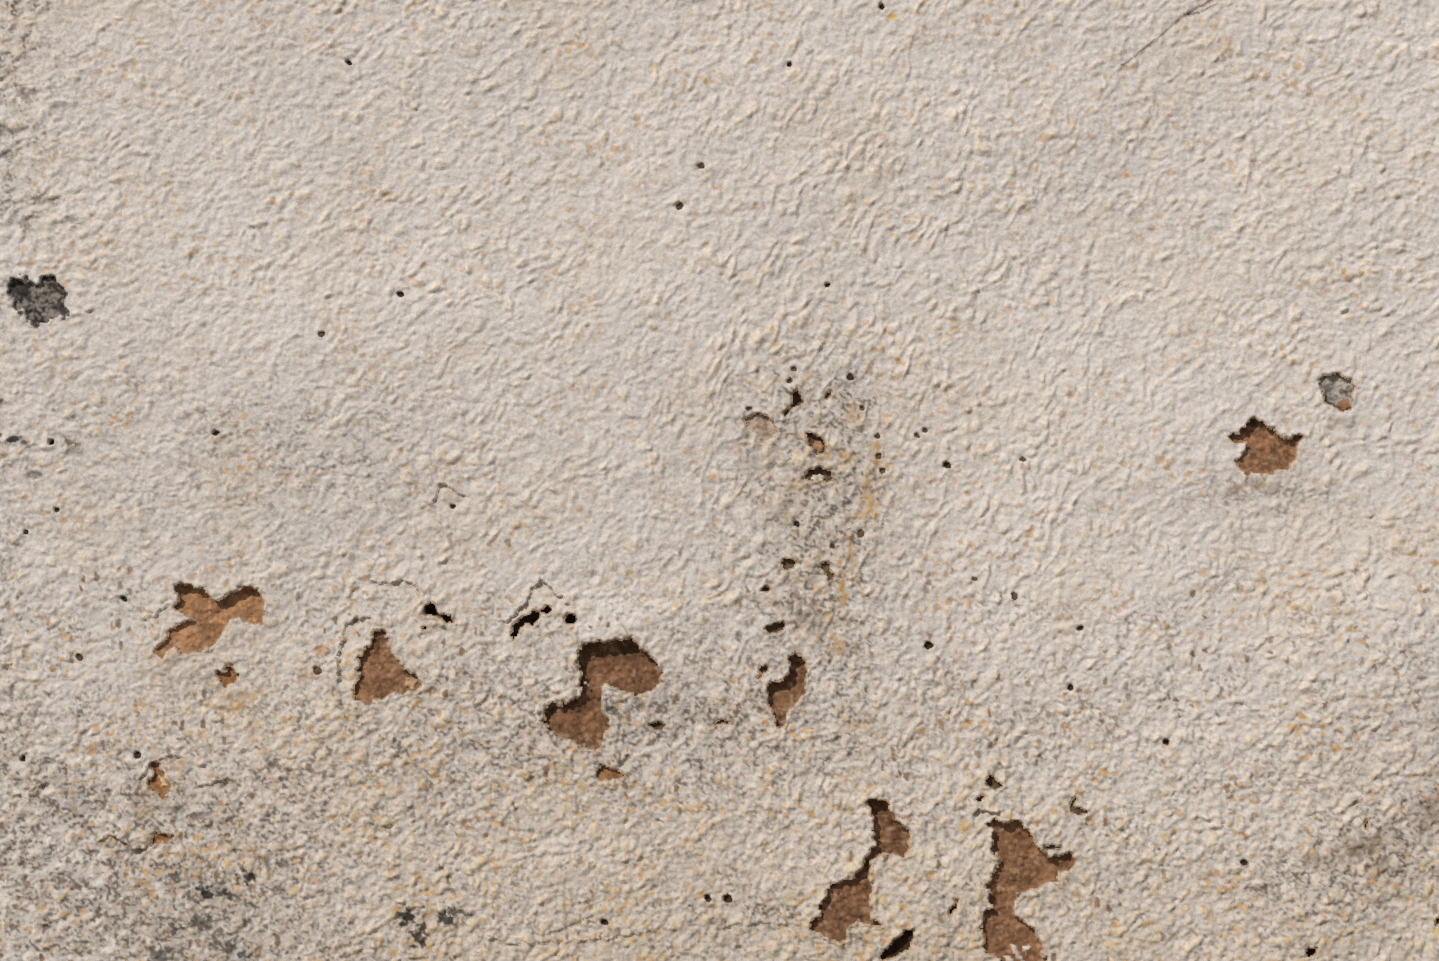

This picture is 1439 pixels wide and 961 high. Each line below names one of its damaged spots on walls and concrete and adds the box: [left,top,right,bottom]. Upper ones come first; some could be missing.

spalling [0,272,73,329]
spalling [1315,369,1360,415]
flaking render [1225,414,1307,480]
flaking render [139,578,268,692]
flaking render [334,613,425,707]
flaking render [491,575,669,784]
peeling [765,622,785,634]
flaking render [758,651,811,732]
flaking render [713,796,914,960]
flaking render [970,775,1082,961]